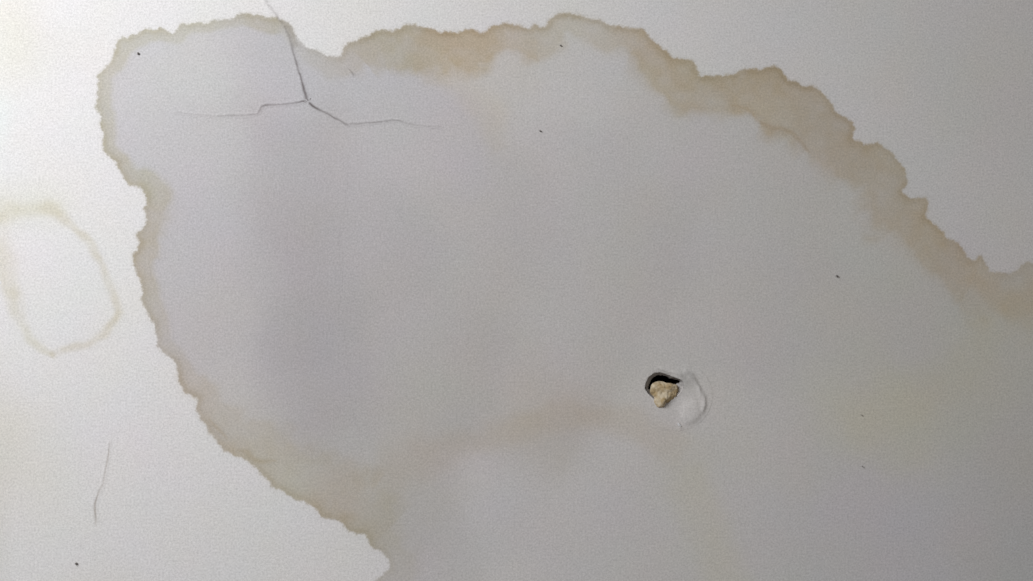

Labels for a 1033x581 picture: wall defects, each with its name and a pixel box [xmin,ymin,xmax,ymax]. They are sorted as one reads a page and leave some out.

crack [172,0,443,130]
water stain [88,8,281,341]
water stain [282,8,1033,324]
water stain [0,192,127,361]
water stain [268,141,359,485]
water stain [151,337,694,581]
spalling [639,360,713,431]
water stain [805,287,1013,465]
water stain [1010,322,1033,349]